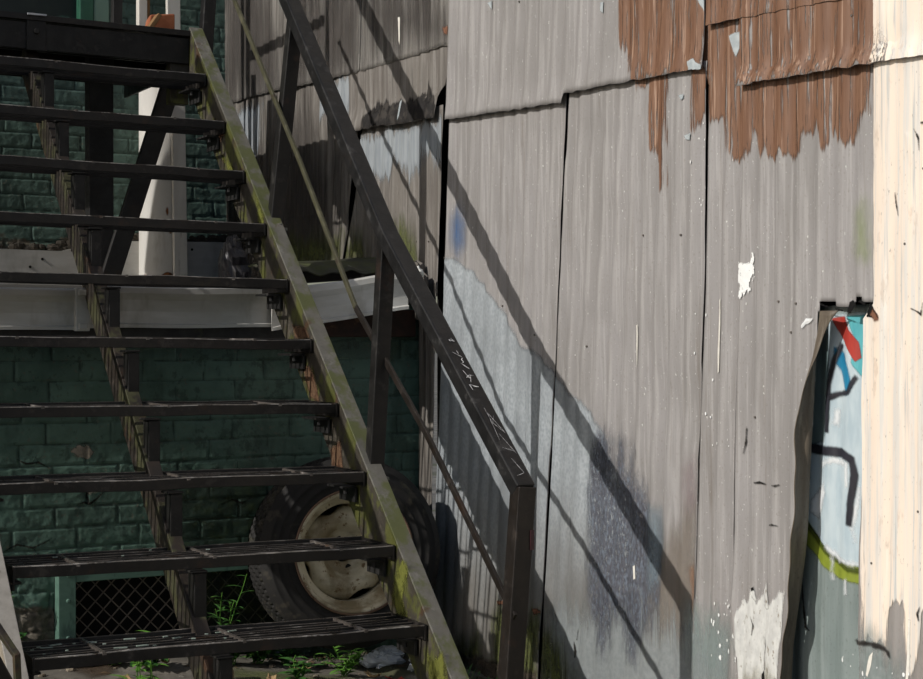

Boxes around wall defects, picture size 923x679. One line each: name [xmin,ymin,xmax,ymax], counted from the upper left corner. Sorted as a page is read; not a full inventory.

water stain [297,53,312,85]
water stain [300,0,446,77]
water stain [361,82,435,129]
peeling [734,584,785,679]